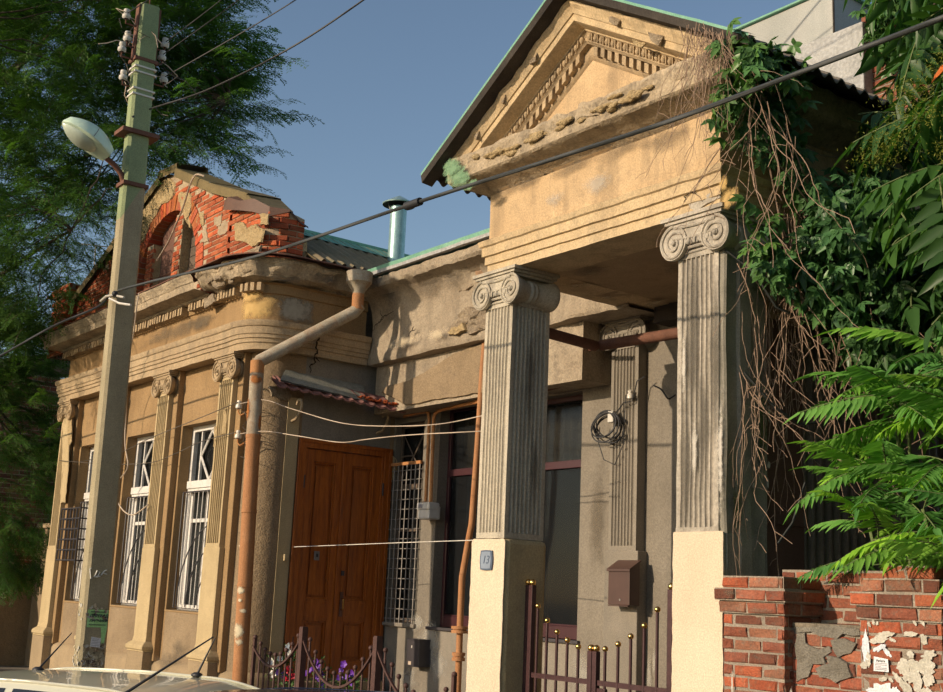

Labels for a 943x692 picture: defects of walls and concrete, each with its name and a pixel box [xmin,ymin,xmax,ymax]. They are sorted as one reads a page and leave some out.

peeling [141,178,269,252]
spalling [204,266,250,309]
crack [309,337,320,373]
peeling [382,306,486,405]
peeling [795,625,861,683]
peeling [896,650,937,692]